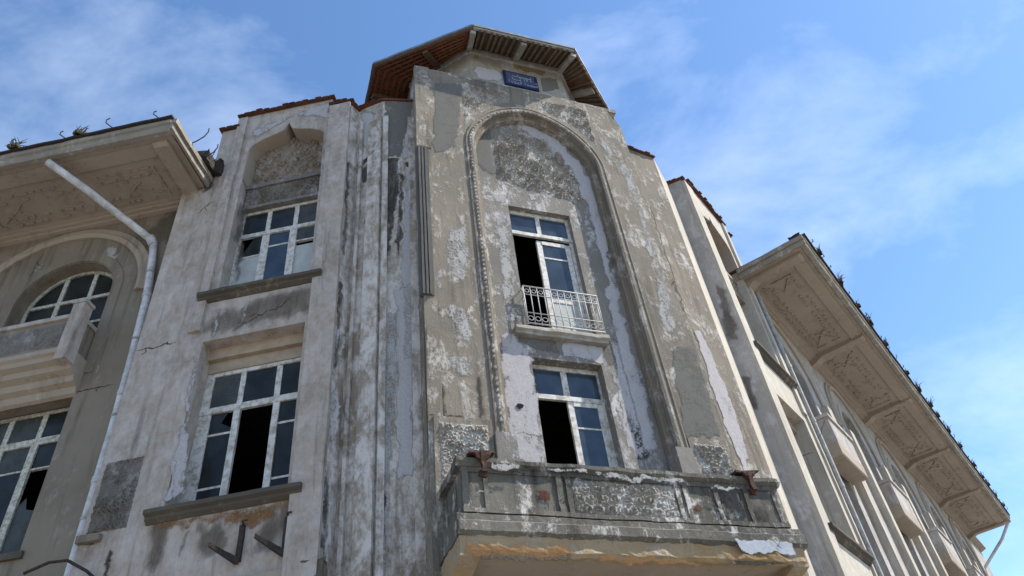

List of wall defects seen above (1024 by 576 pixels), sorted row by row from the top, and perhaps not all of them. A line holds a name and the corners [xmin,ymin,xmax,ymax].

peeling [436,227,470,289]
peeling [449,304,472,342]
peeling [484,176,543,462]
peeling [521,125,657,458]
peeling [163,356,198,502]
peeling [695,330,754,478]
damp [150,525,167,566]